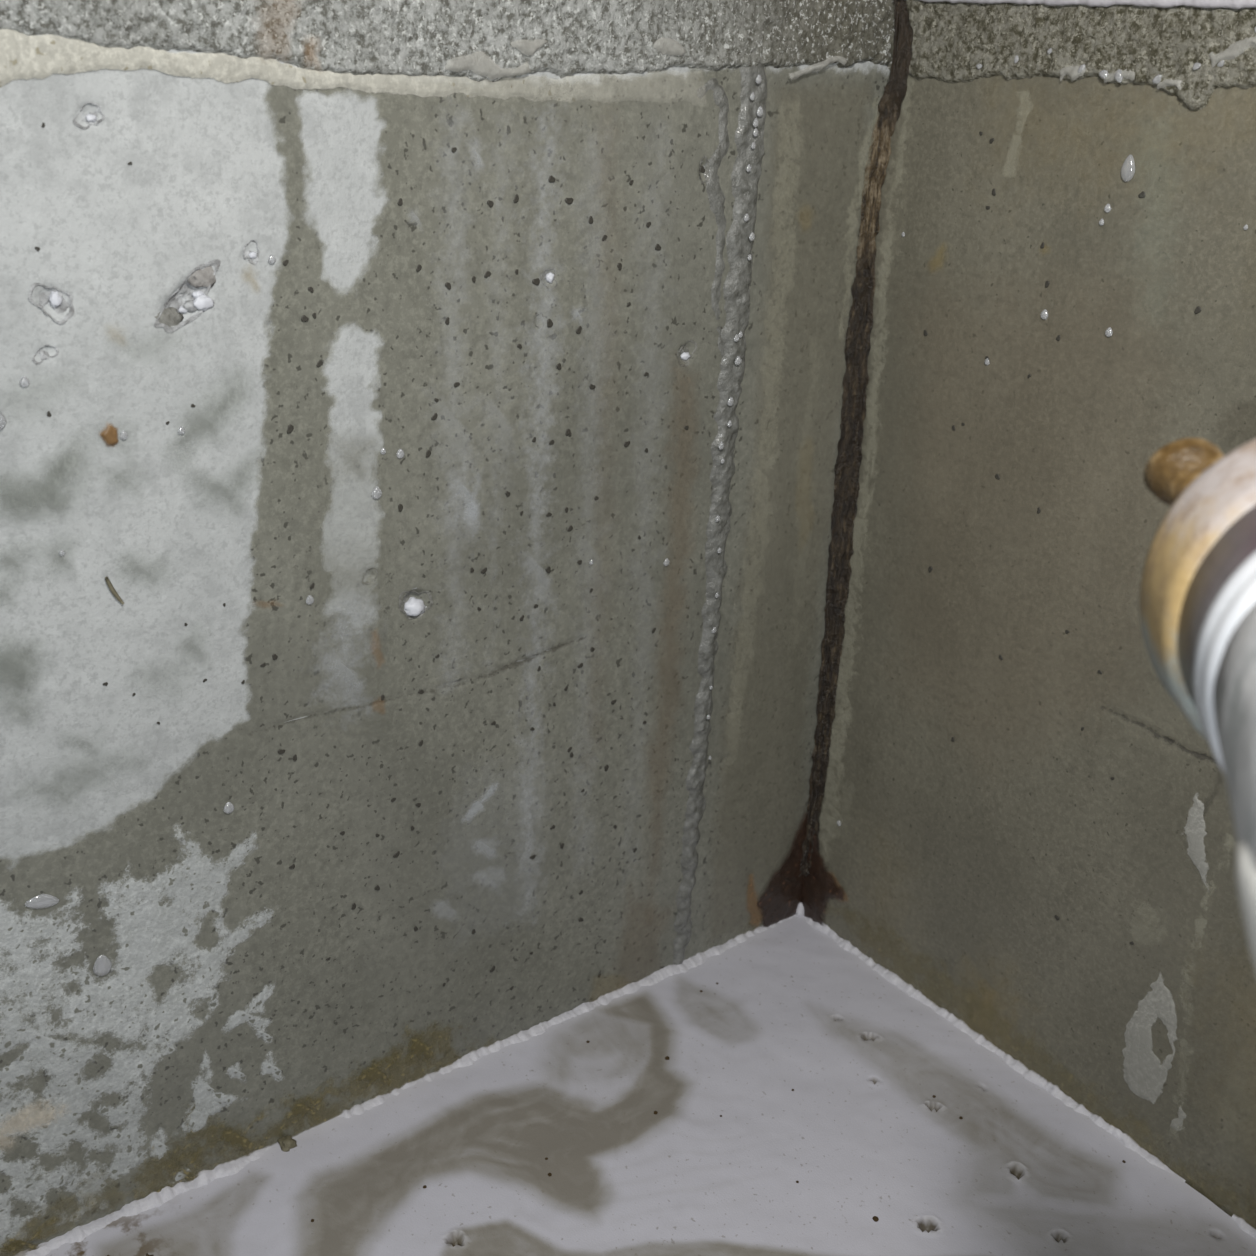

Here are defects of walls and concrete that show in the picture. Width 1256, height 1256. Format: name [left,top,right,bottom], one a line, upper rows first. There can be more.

crack [798,0,914,877]
leakage [0,56,890,1256]
leakage [818,65,1256,1229]
crack [1101,706,1218,765]
corrosion [747,812,848,927]
peeling [1184,793,1209,887]
peeling [1122,973,1177,1104]